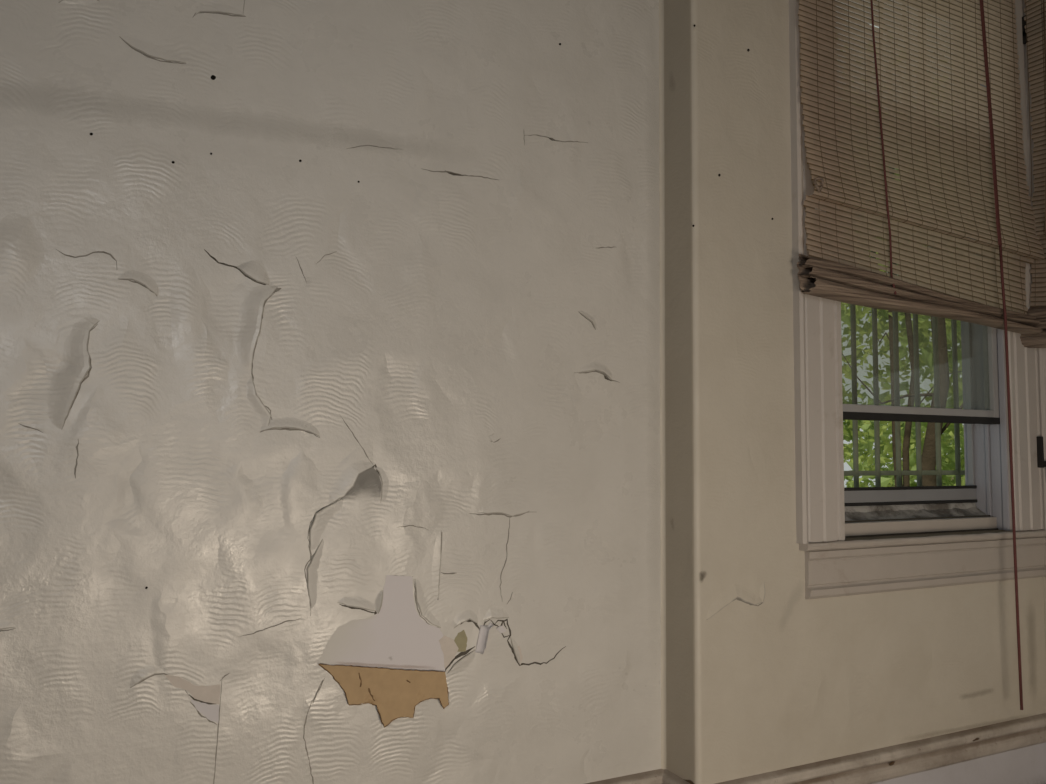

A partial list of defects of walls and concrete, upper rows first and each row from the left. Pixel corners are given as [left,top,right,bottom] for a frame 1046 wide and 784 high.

crack [193,0,246,17]
crack [119,36,186,64]
crack [524,135,587,145]
crack [421,168,498,180]
crack [56,249,159,296]
crack [204,249,320,438]
crack [576,361,620,383]
crack [339,414,372,463]
crack [470,498,566,666]
peeling [318,575,494,727]
peeling [130,665,229,784]
crack [303,678,325,784]